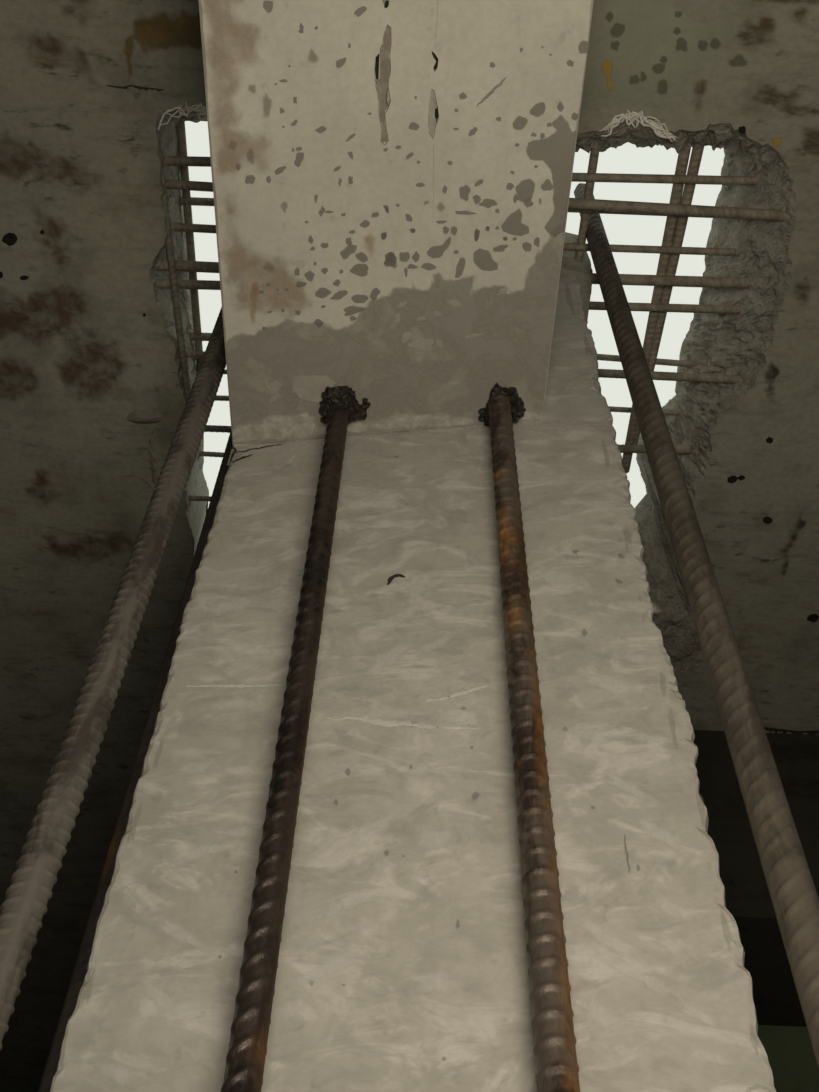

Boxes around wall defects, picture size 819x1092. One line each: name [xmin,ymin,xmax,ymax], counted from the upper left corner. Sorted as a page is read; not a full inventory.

corrosion [125,14,202,74]
spalling [375,24,392,142]
spalling [428,89,439,135]
spalling [0,108,233,1092]
spalling [221,375,349,1092]
spalling [488,395,580,1092]
spalling [561,121,819,1068]